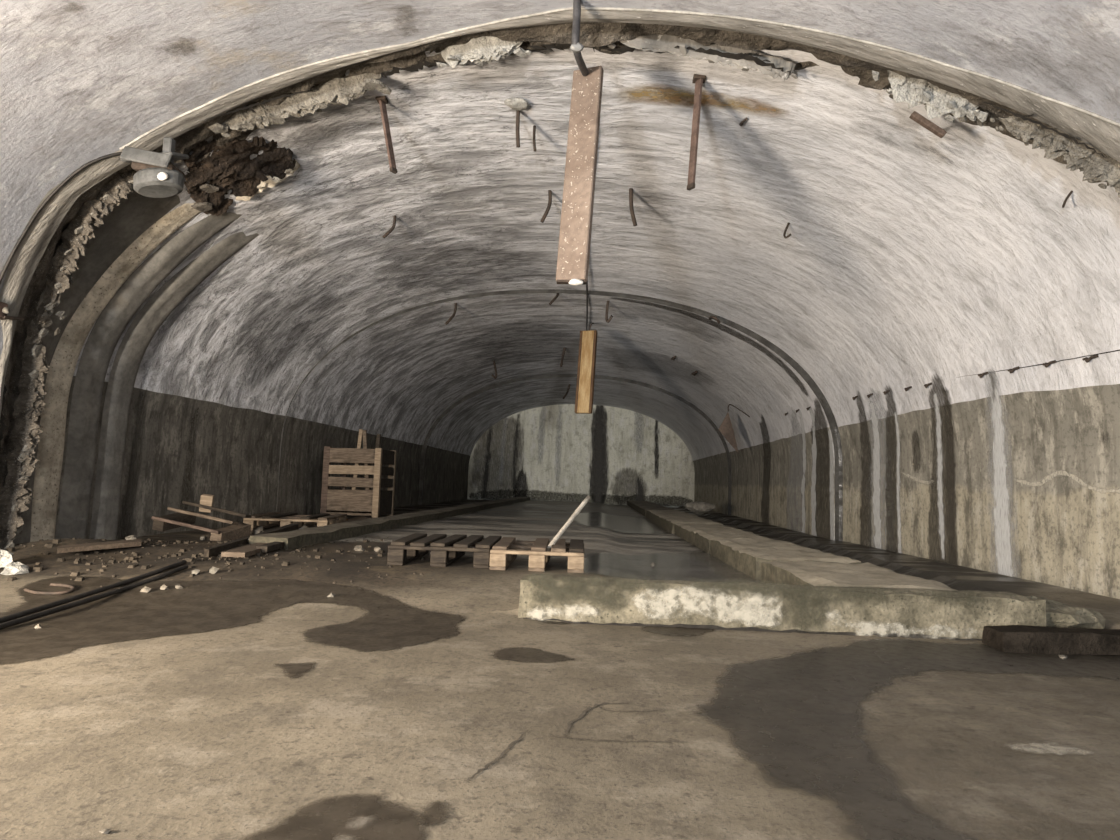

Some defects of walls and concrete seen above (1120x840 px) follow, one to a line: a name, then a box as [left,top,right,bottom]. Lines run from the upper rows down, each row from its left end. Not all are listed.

spalling [183,73,392,216]
peeling [436,36,532,69]
spalling [607,34,798,80]
rust [630,87,779,113]
spalling [872,70,1120,198]
spalling [0,170,137,575]
leakage [857,376,958,565]
leakage [987,372,1120,577]
leakage [0,576,465,664]
crack [464,702,676,781]
leakage [698,622,1120,840]
leakage [240,795,446,840]